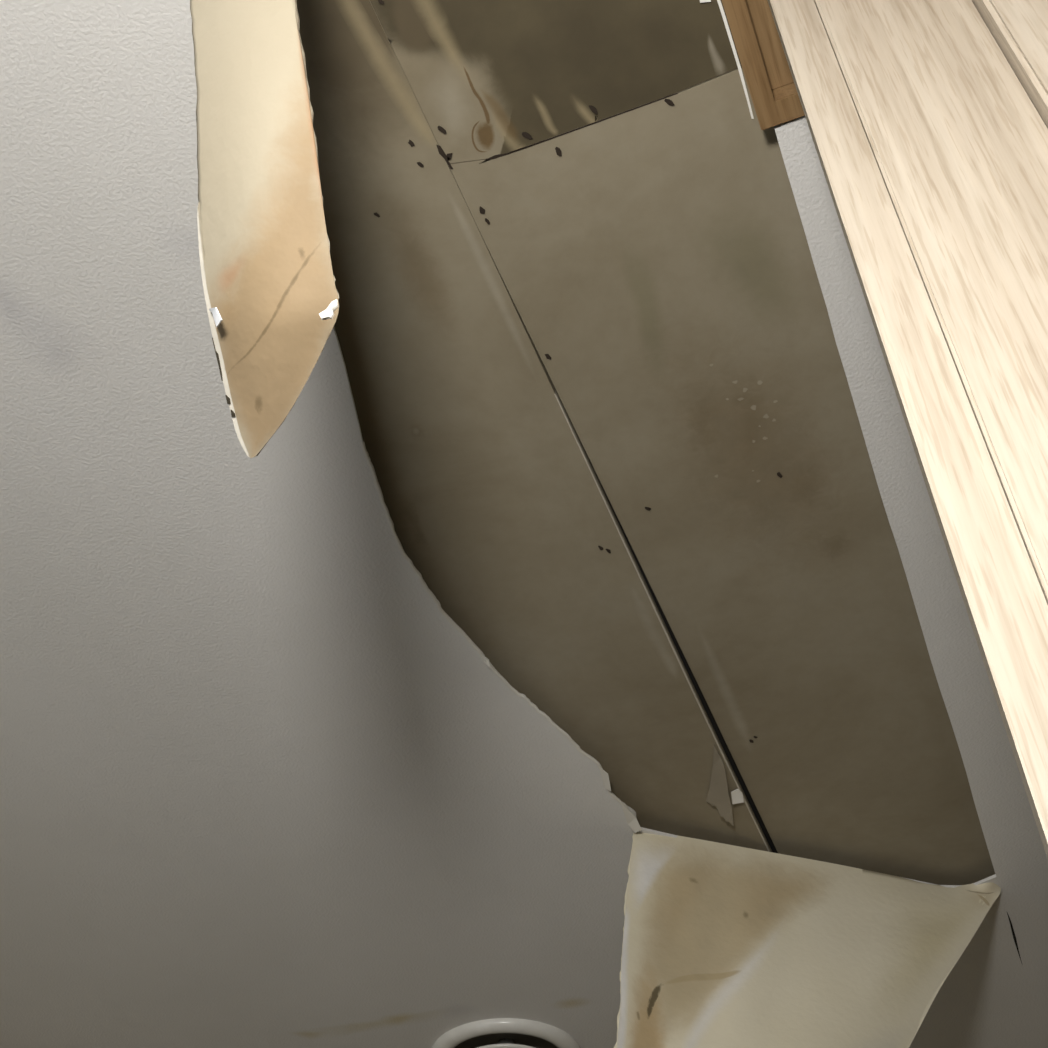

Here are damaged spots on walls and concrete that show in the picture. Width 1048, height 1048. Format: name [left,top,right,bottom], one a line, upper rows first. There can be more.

peeling [600,767,611,791]
peeling [731,789,744,804]
peeling [621,803,641,833]